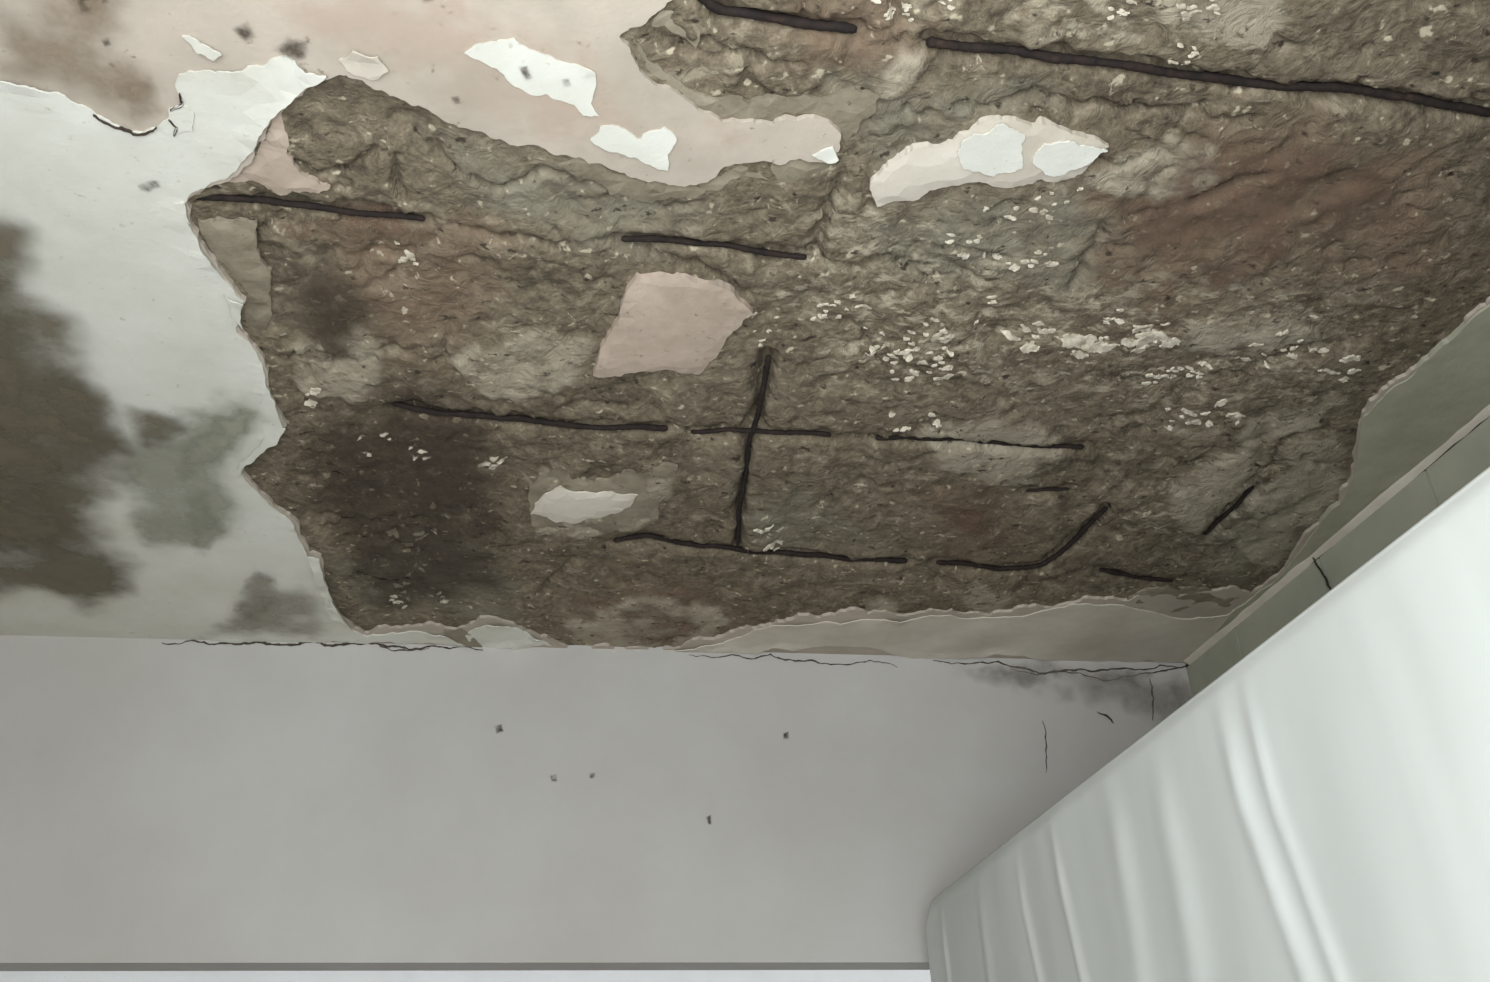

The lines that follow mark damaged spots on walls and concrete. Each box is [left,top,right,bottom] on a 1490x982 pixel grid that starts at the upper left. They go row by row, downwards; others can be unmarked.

leakage [280,43,304,58]
spalling [0,0,1490,663]
leakage [0,225,251,600]
leakage [229,574,310,633]
crack [163,640,483,651]